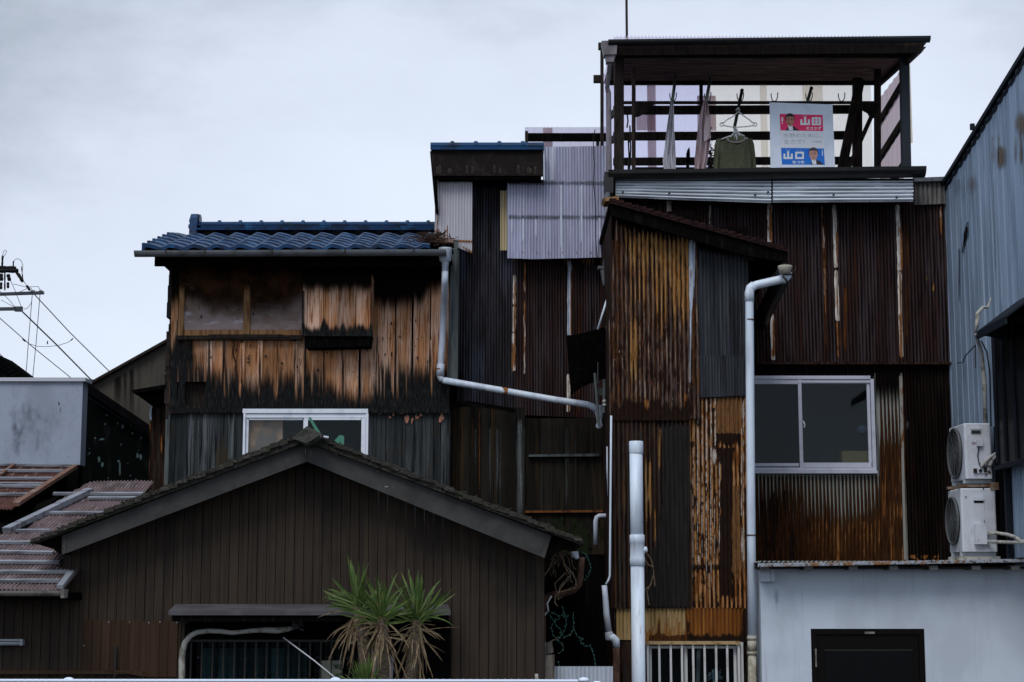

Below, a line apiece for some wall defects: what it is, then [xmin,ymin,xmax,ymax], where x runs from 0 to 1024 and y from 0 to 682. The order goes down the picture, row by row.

rust [626,228,693,382]
rust [691,464,718,602]
rust [702,395,741,443]
rust [755,371,939,566]